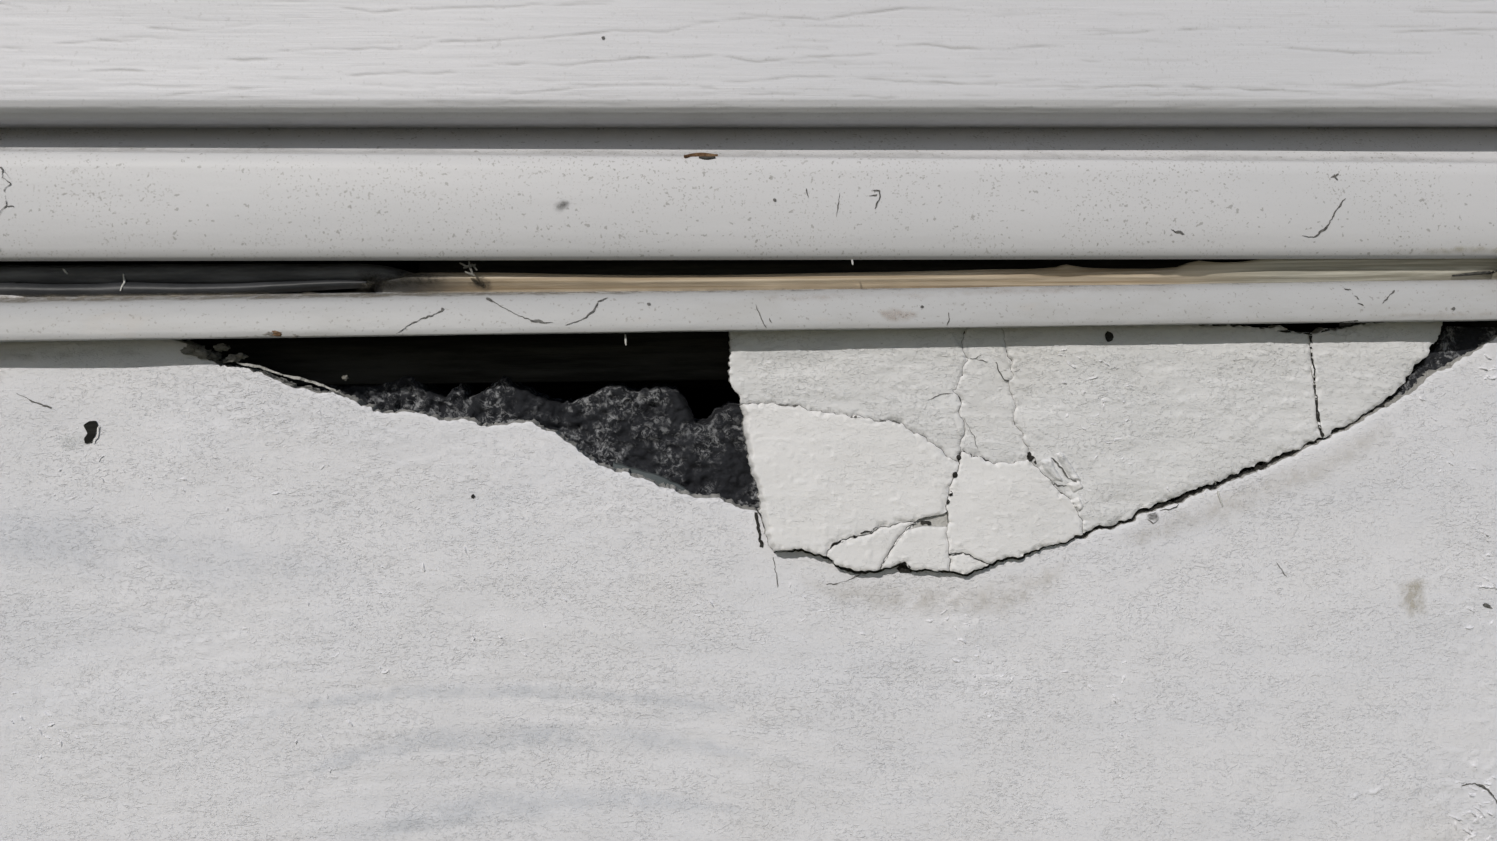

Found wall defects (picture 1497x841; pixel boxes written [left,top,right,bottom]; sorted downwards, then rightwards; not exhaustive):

spalling [180,343,764,527]
crack [739,326,1497,587]